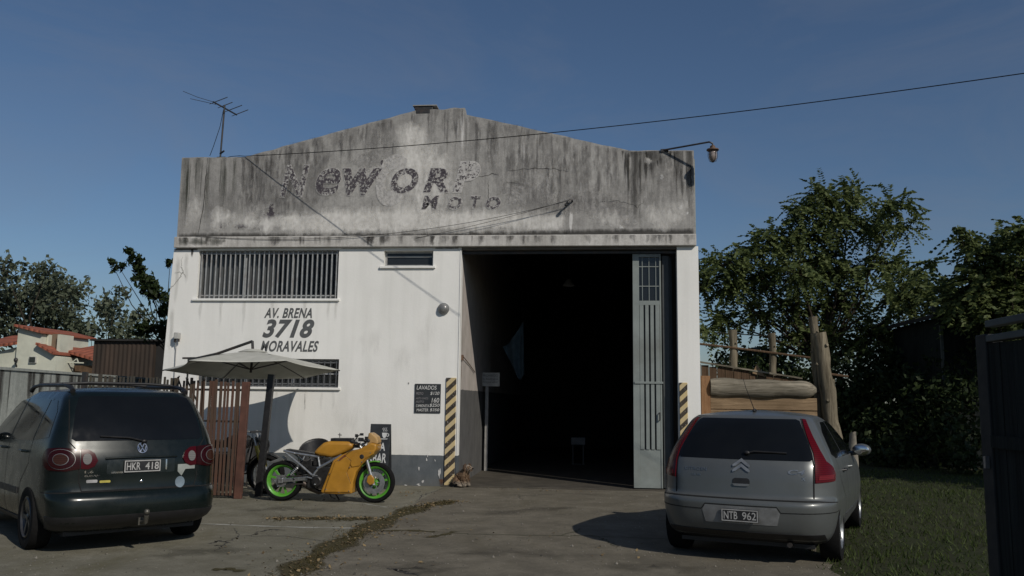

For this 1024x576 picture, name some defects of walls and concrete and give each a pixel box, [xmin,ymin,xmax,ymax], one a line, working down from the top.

damp [625,151,658,188]
damp [176,212,693,255]